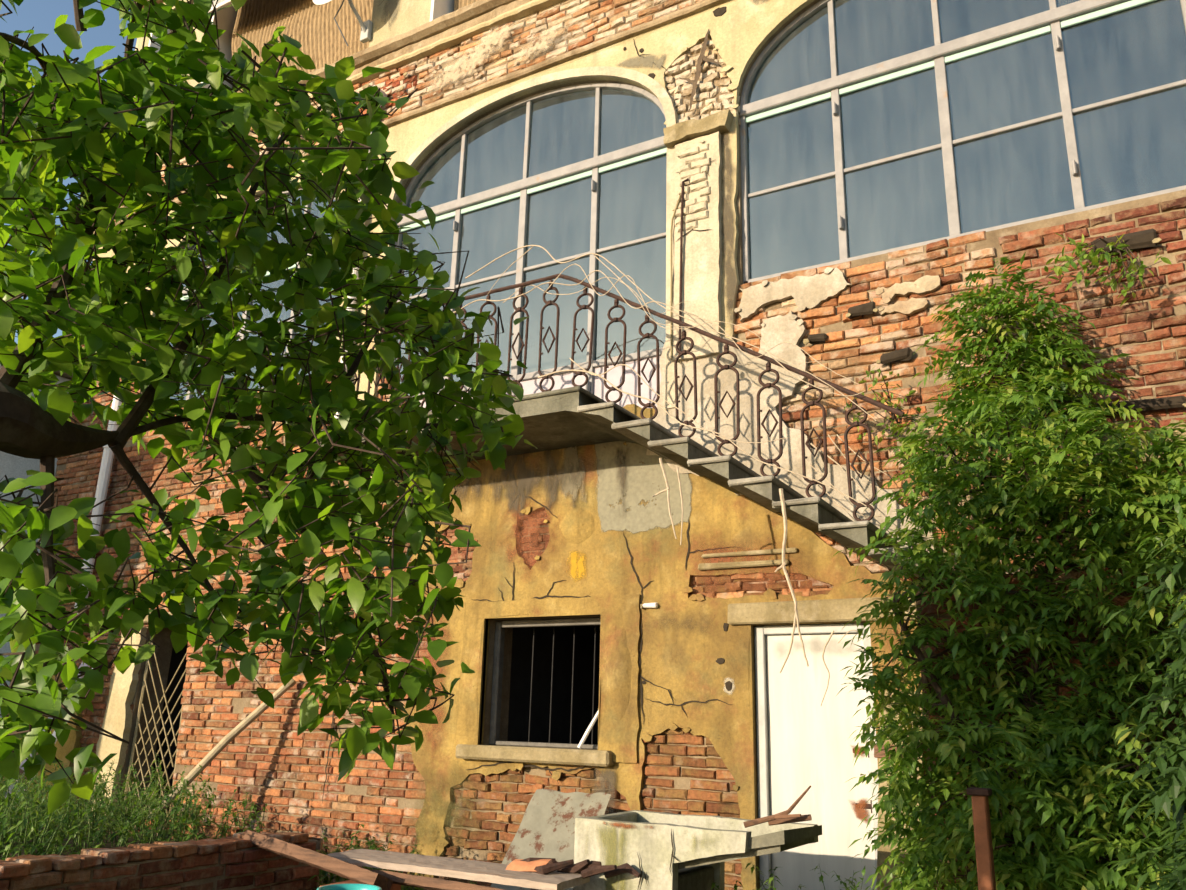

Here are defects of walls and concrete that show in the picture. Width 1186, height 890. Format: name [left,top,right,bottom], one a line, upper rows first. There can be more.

flaking render [648,38,741,125]
flaking render [672,140,711,232]
flaking render [845,275,941,319]
flaking render [734,267,852,414]
spalling [876,347,913,364]
damp [454,446,584,511]
damp [617,449,626,488]
crack [471,563,591,602]
flaking render [681,549,831,601]
crack [623,534,733,724]
flaking render [437,722,740,871]
flaking render [437,876,492,886]